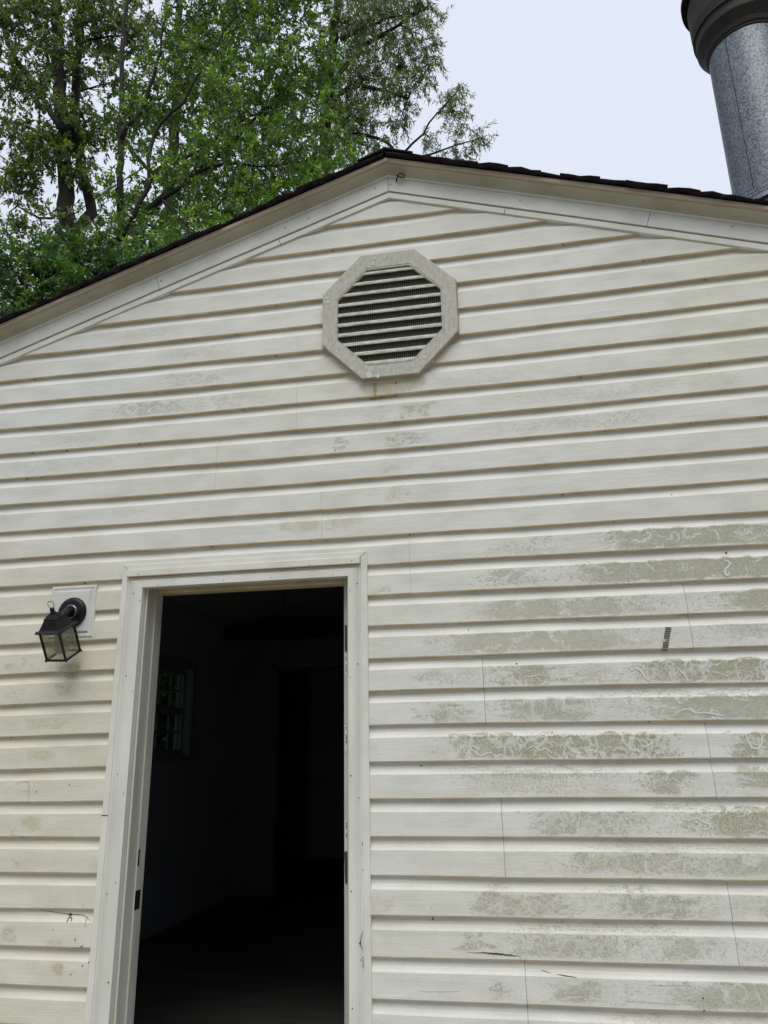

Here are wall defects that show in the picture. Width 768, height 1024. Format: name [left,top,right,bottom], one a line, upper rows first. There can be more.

water stain [411,523,768,966]
crack [467,950,516,958]
water stain [542,978,768,1024]